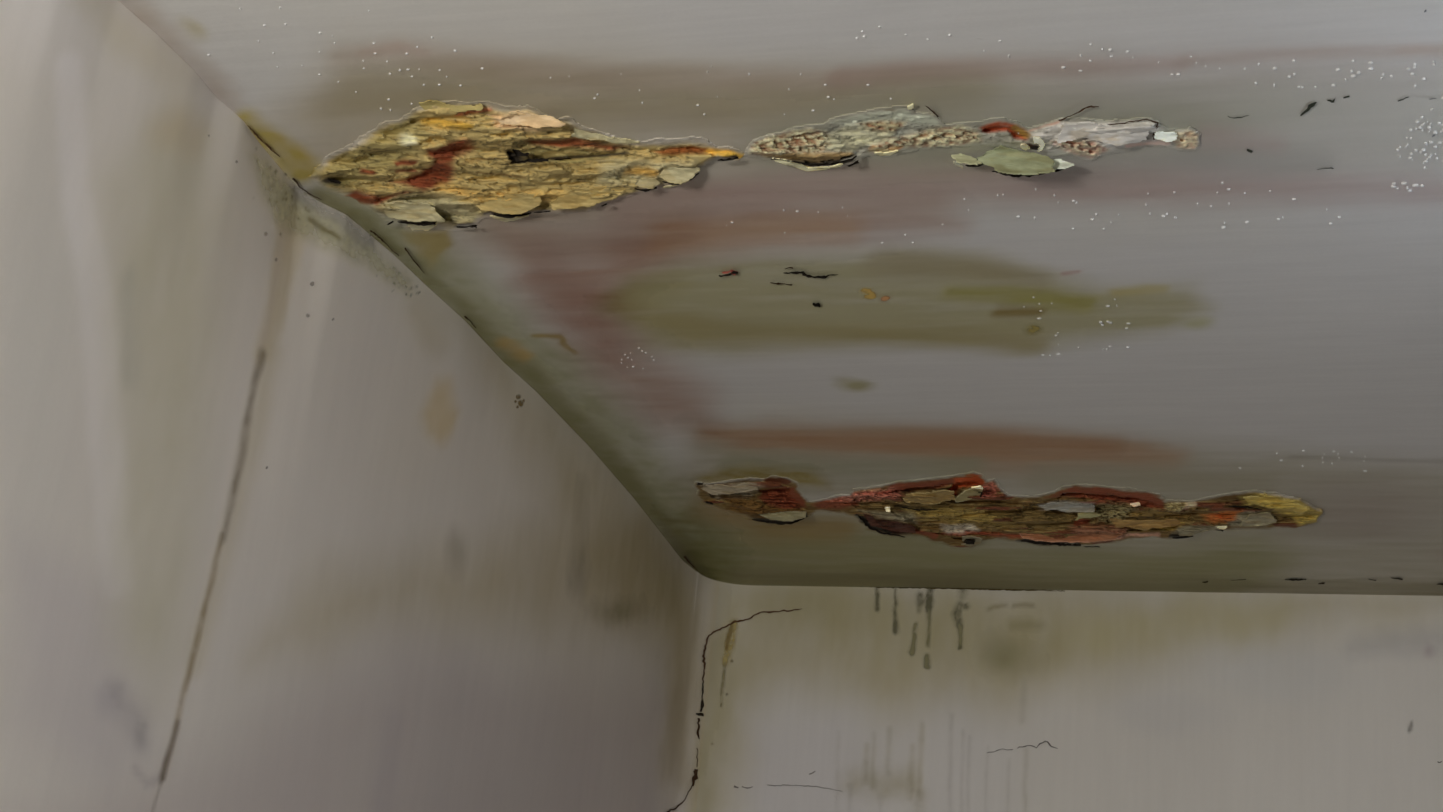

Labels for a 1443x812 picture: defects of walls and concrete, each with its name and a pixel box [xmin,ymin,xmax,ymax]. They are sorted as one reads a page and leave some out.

flaking render [308,100,1201,232]
flaking render [694,471,1323,549]
damp [876,588,932,669]
crack [667,609,800,812]
crack [734,771,842,792]